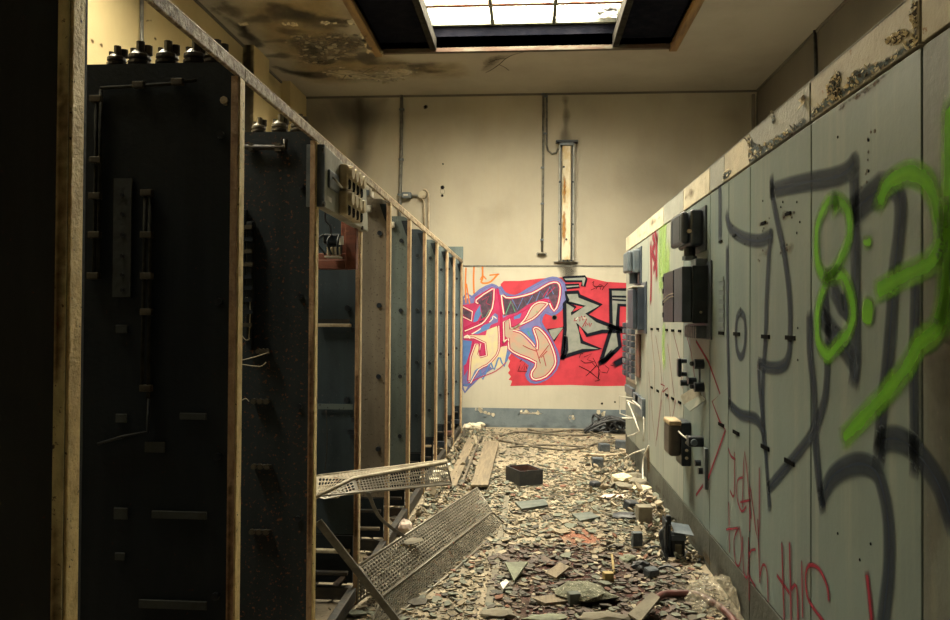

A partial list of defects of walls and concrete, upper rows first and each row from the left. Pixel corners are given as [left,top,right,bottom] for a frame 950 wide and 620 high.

leakage [238,0,443,78]
peeling [282,19,418,84]
peeling [744,1,918,161]